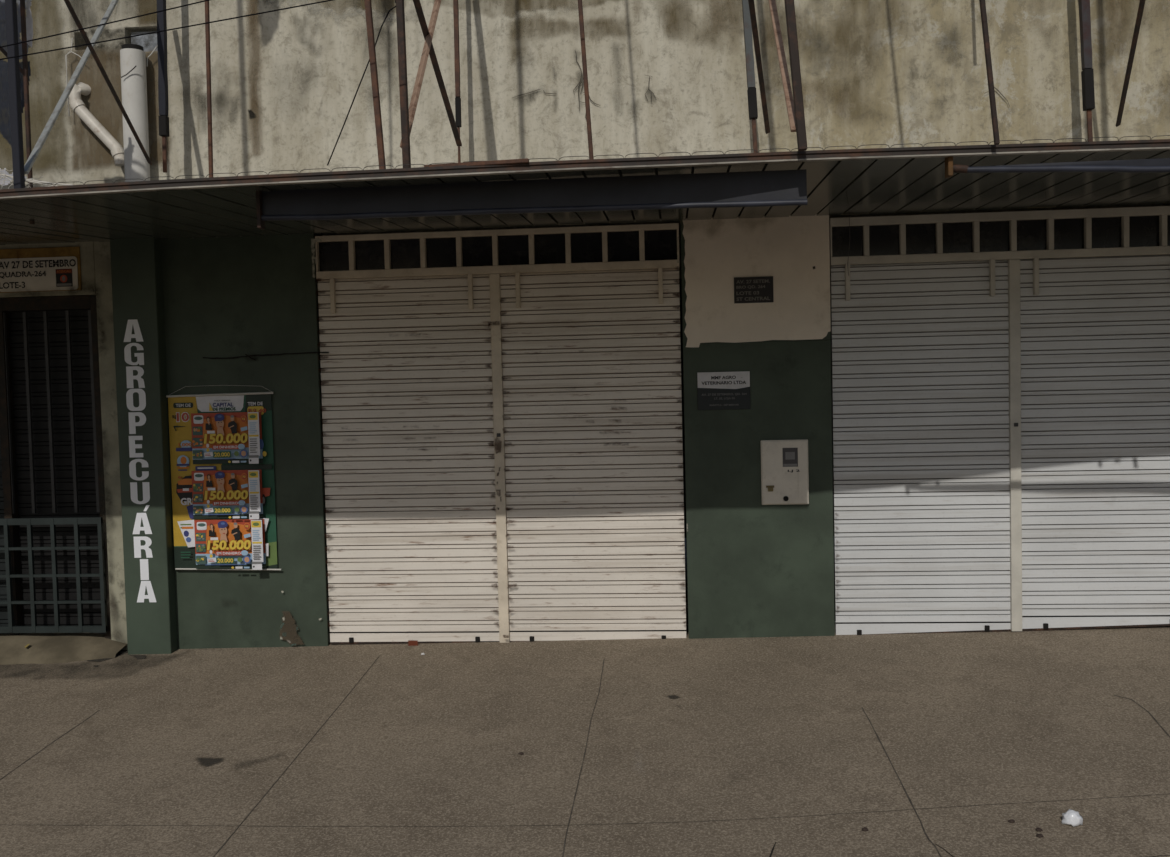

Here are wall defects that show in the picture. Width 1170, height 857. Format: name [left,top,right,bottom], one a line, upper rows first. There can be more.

damp [507,0,558,37]